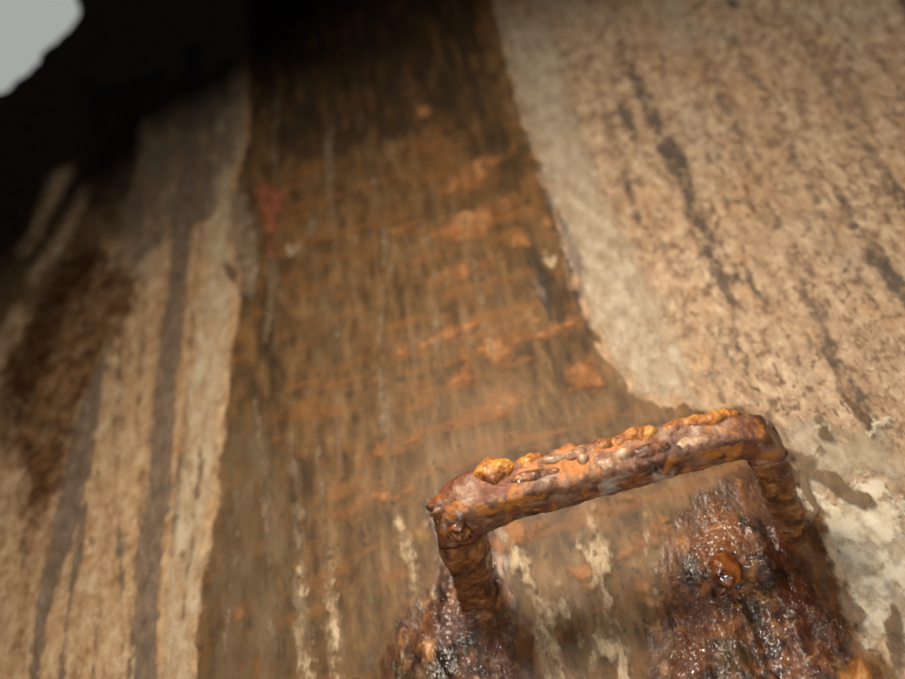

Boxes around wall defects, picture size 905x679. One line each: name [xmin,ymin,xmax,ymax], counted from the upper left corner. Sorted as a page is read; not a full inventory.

water stain [617,31,761,316]
water stain [127,0,705,679]
water stain [29,340,110,679]
water stain [116,528,124,588]
corrosion [380,489,450,679]
corrosion [489,520,586,679]
corrosion [473,408,740,484]
water stain [491,460,754,679]
corrosion [635,468,776,679]
corrosion [774,507,893,679]